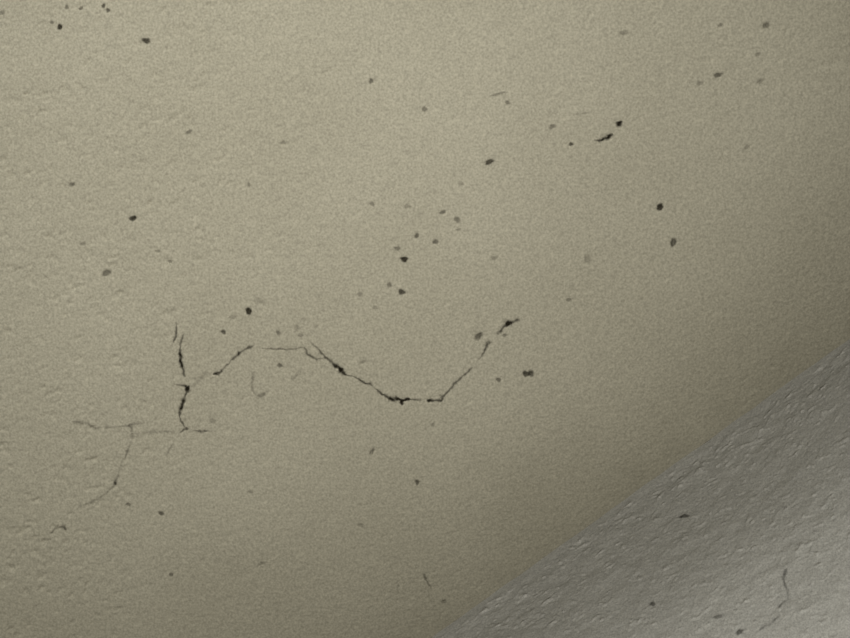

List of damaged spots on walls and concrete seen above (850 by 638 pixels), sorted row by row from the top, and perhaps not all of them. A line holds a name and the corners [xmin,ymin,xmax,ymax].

crack [175,337,189,430]
crack [325,357,446,405]